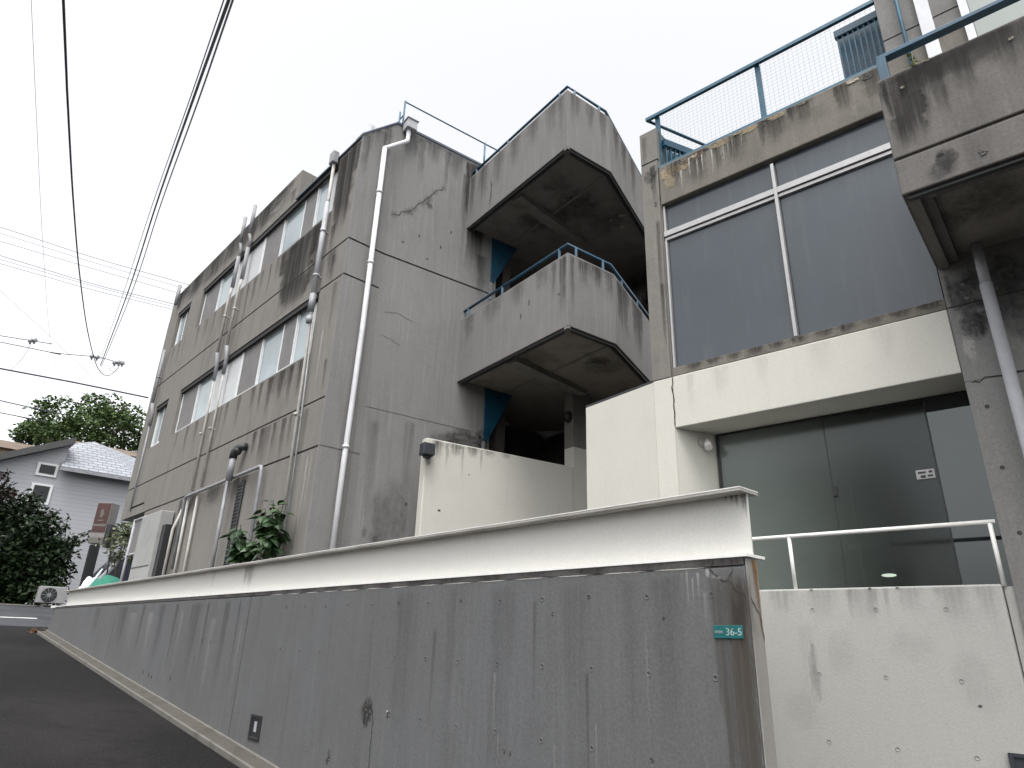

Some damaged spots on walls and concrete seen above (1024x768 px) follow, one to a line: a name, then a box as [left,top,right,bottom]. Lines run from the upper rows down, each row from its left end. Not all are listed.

peeling [651,112,784,189]
crack [391,187,444,216]
leakage [280,221,322,301]
crack [710,558,765,640]